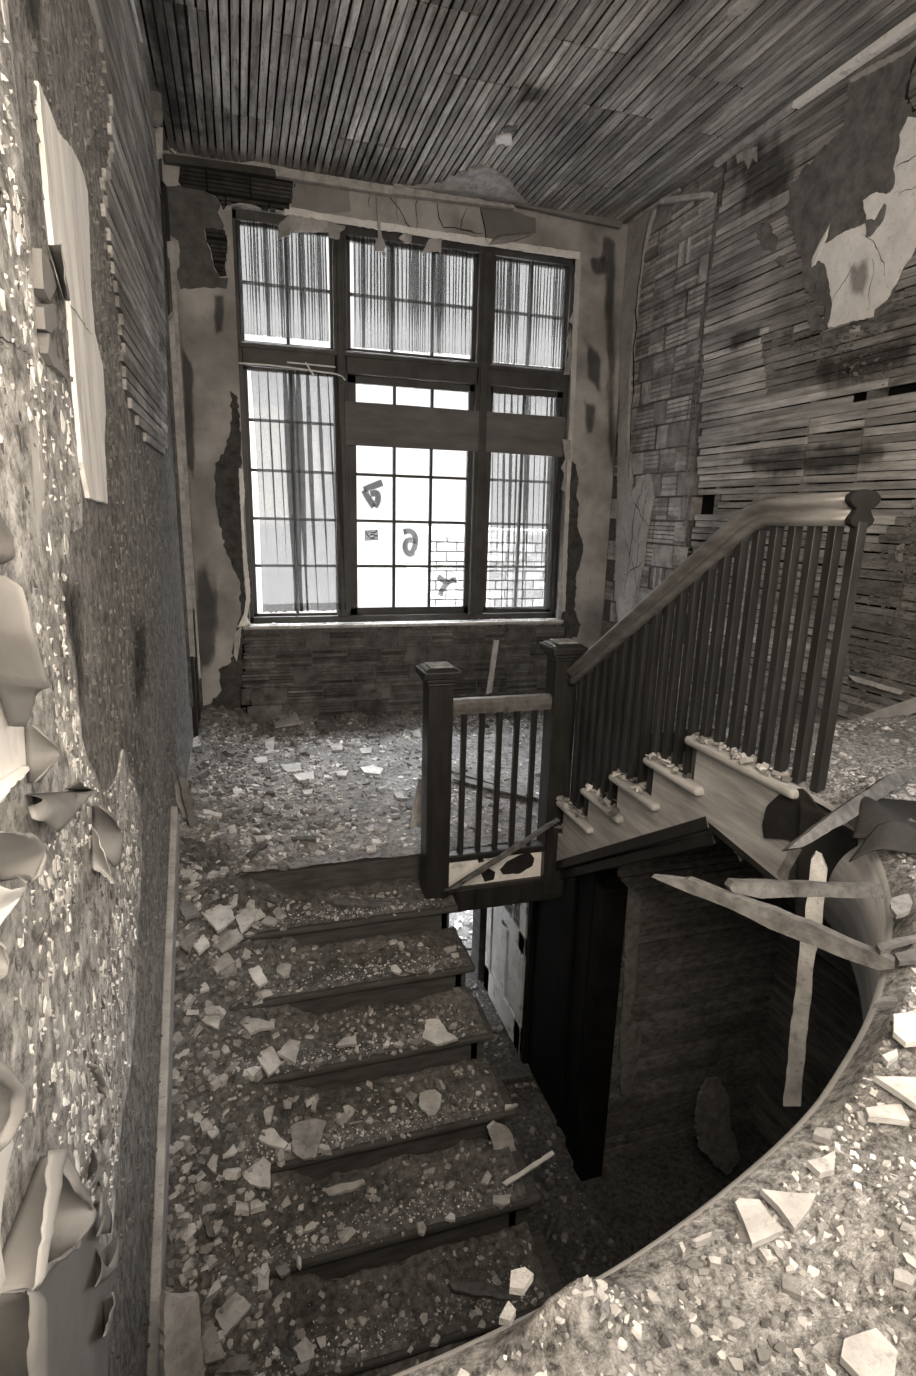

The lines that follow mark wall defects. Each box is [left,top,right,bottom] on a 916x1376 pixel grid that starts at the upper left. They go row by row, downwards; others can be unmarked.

spalling [166,166,351,289]
crack [368,196,487,240]
spalling [754,40,916,333]
spalling [0,0,226,1376]
flaking render [210,391,583,758]